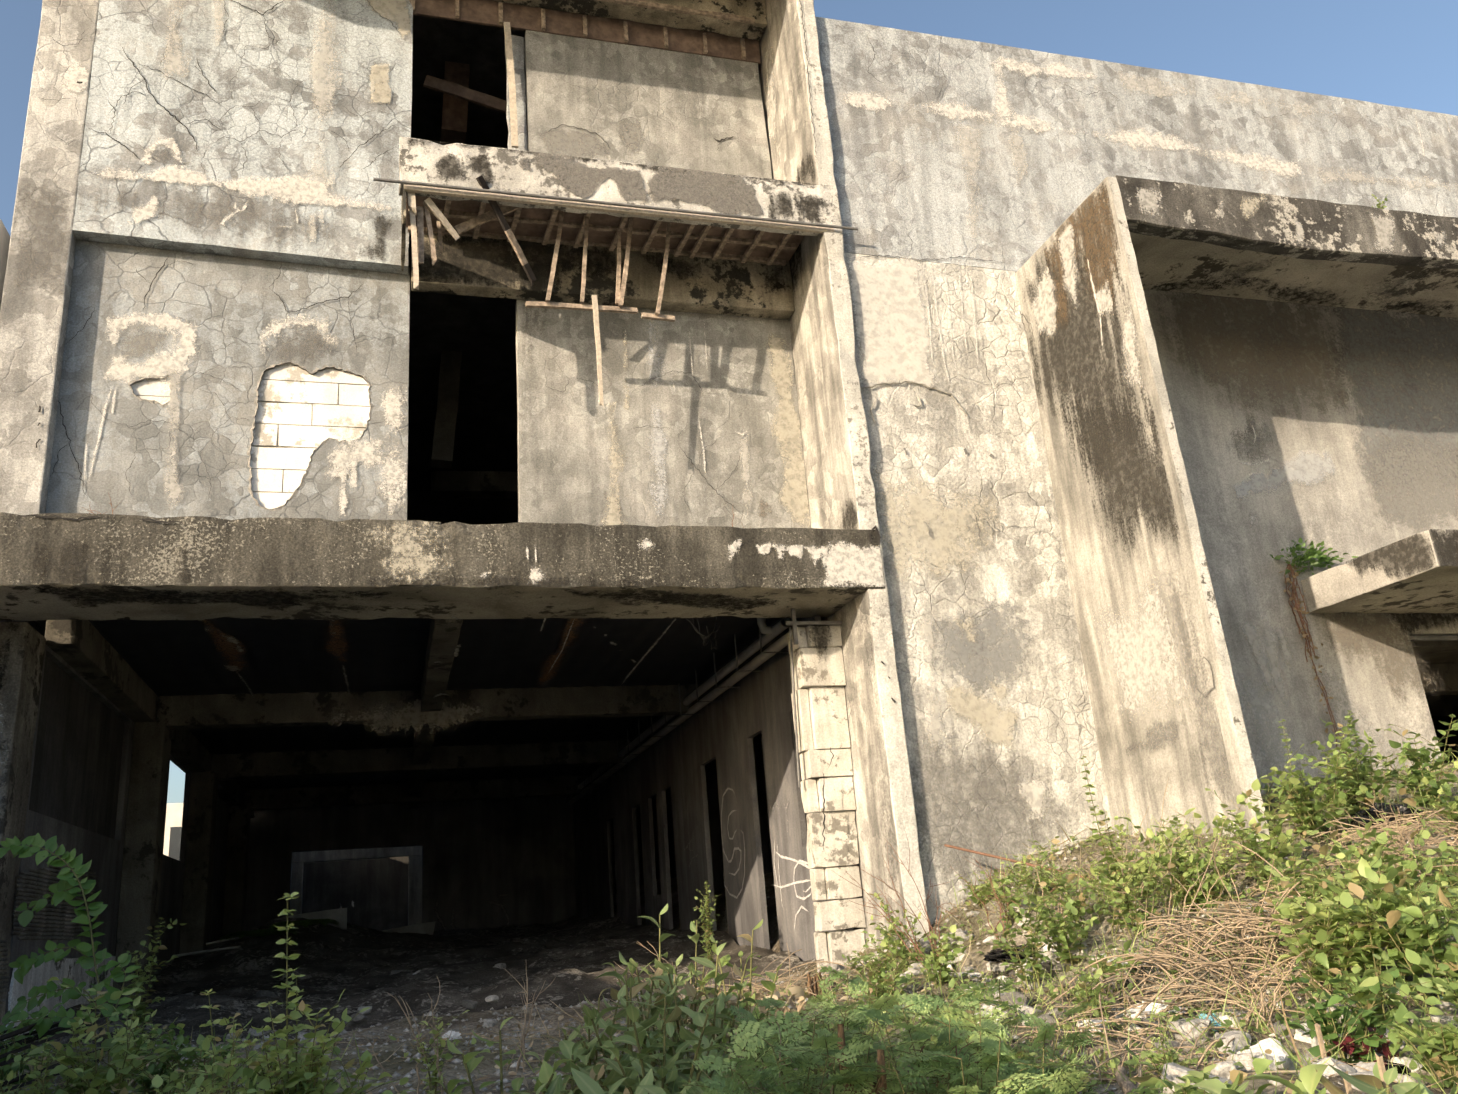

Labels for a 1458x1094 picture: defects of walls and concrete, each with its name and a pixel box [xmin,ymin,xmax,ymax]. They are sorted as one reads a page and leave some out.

crack [42,0,394,175]
peeling [519,152,764,215]
crack [136,258,192,309]
crack [273,264,359,348]
crack [19,341,255,523]
peeling [128,373,174,408]
peeling [247,361,374,511]
damp [1028,244,1179,550]
peeling [728,526,885,587]